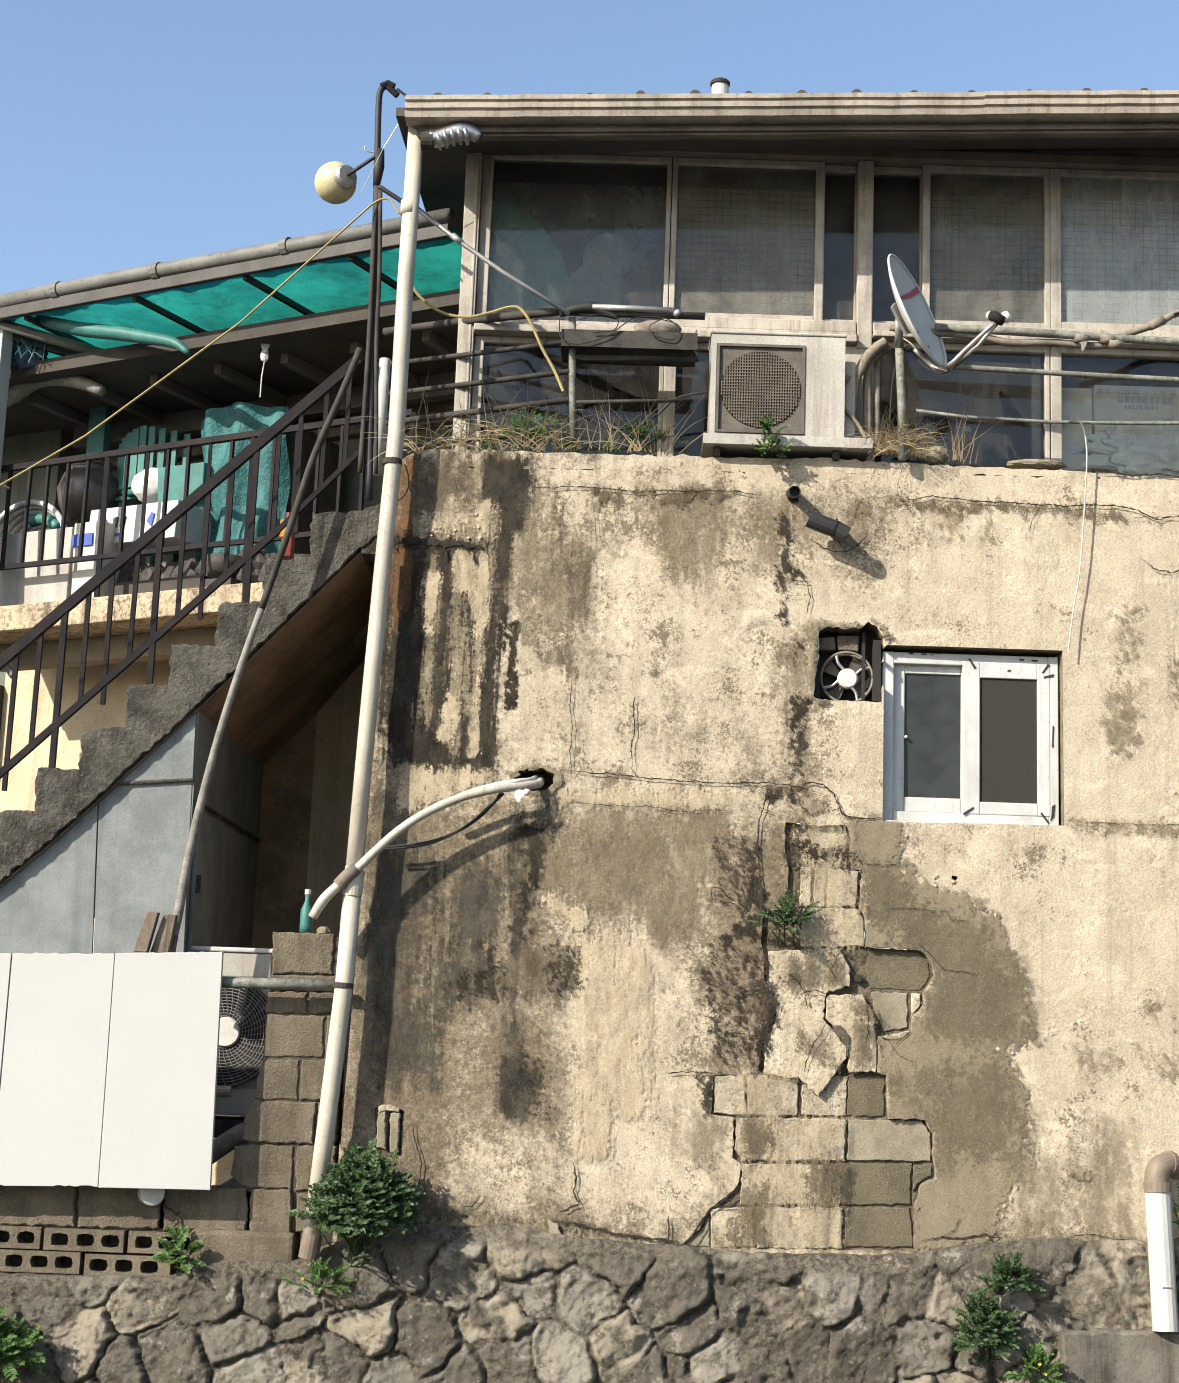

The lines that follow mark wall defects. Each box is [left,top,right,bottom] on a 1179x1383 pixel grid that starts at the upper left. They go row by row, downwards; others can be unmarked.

leakage [752,491,806,667]
crack [812,470,1179,552]
leakage [349,450,769,1164]
crack [563,680,880,907]
spalling [685,812,1147,1254]
crack [554,1163,738,1246]
crack [922,1219,1002,1242]
crack [1067,1233,1125,1241]